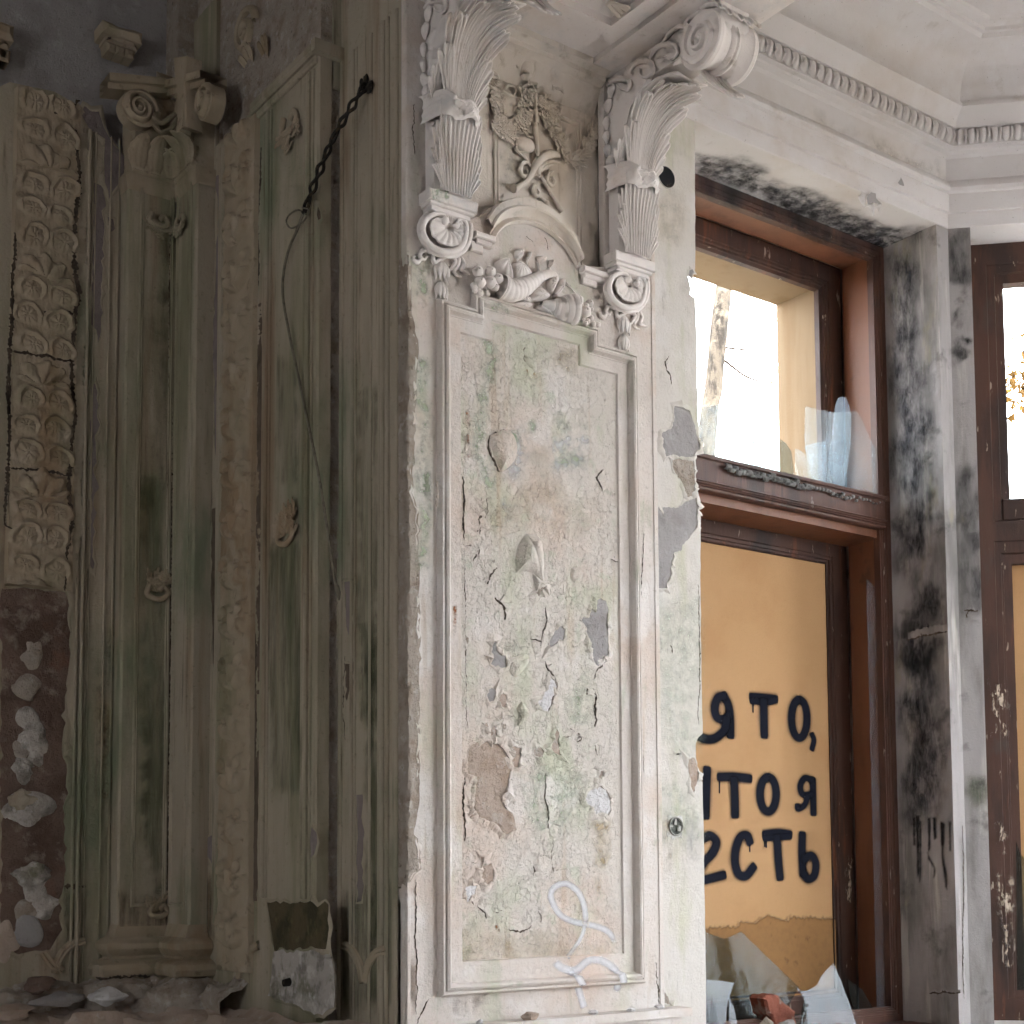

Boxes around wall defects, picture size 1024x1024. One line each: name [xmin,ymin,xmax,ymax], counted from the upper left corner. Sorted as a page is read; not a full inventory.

flaking render [0,586,75,963]
crack [3,100,93,593]
flaking render [253,296,337,1019]
crack [461,477,610,951]
flaking render [462,594,616,841]
crack [595,470,613,491]
flaking render [657,399,704,594]